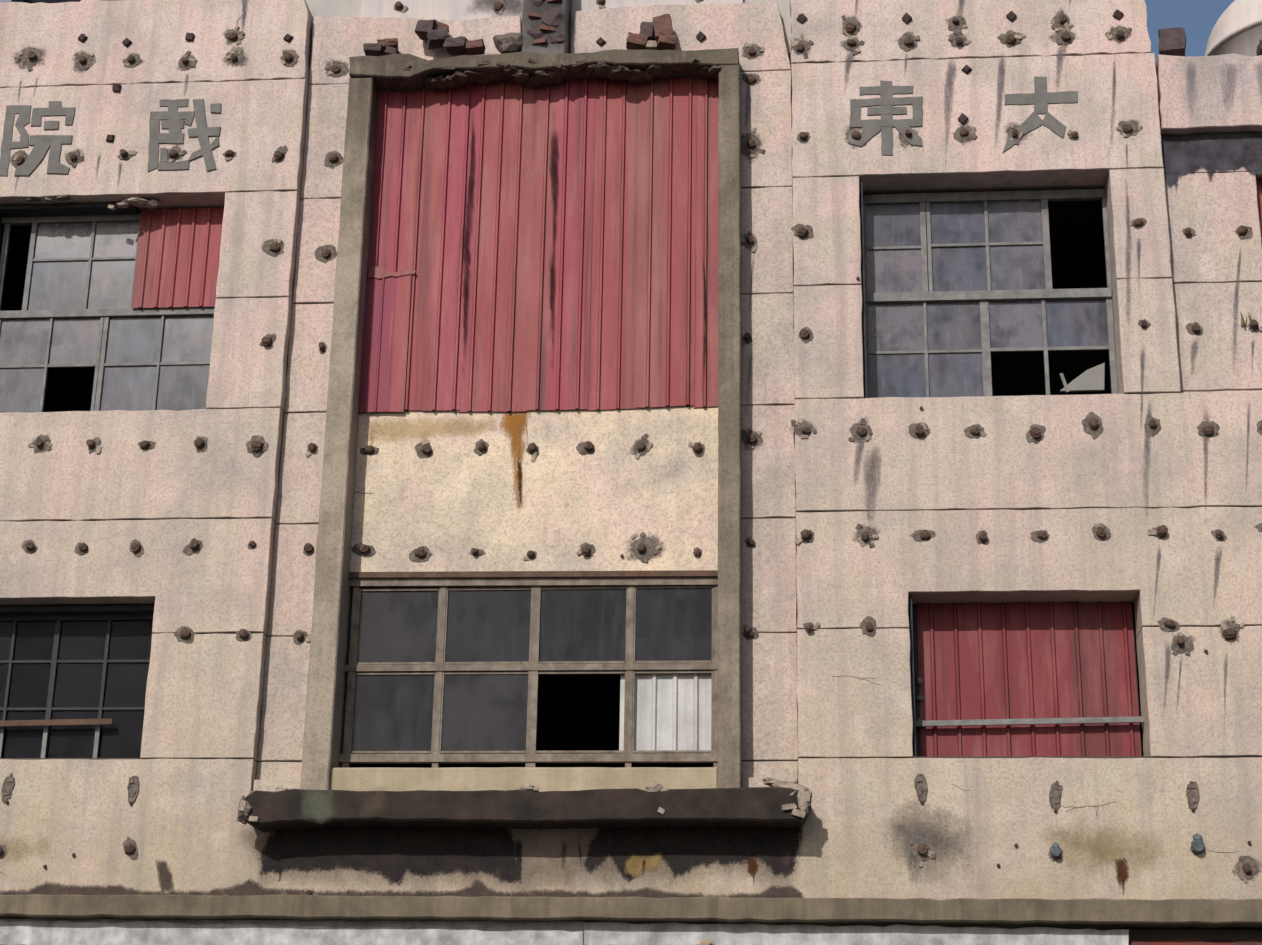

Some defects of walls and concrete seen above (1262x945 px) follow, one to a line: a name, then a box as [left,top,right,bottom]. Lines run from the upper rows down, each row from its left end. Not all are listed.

spalling [423,0,722,91]
water stain [945,66,955,121]
corrosion [502,412,527,505]
spalling [763,777,813,819]
water stain [0,826,803,898]
corrosion [1116,859,1128,891]